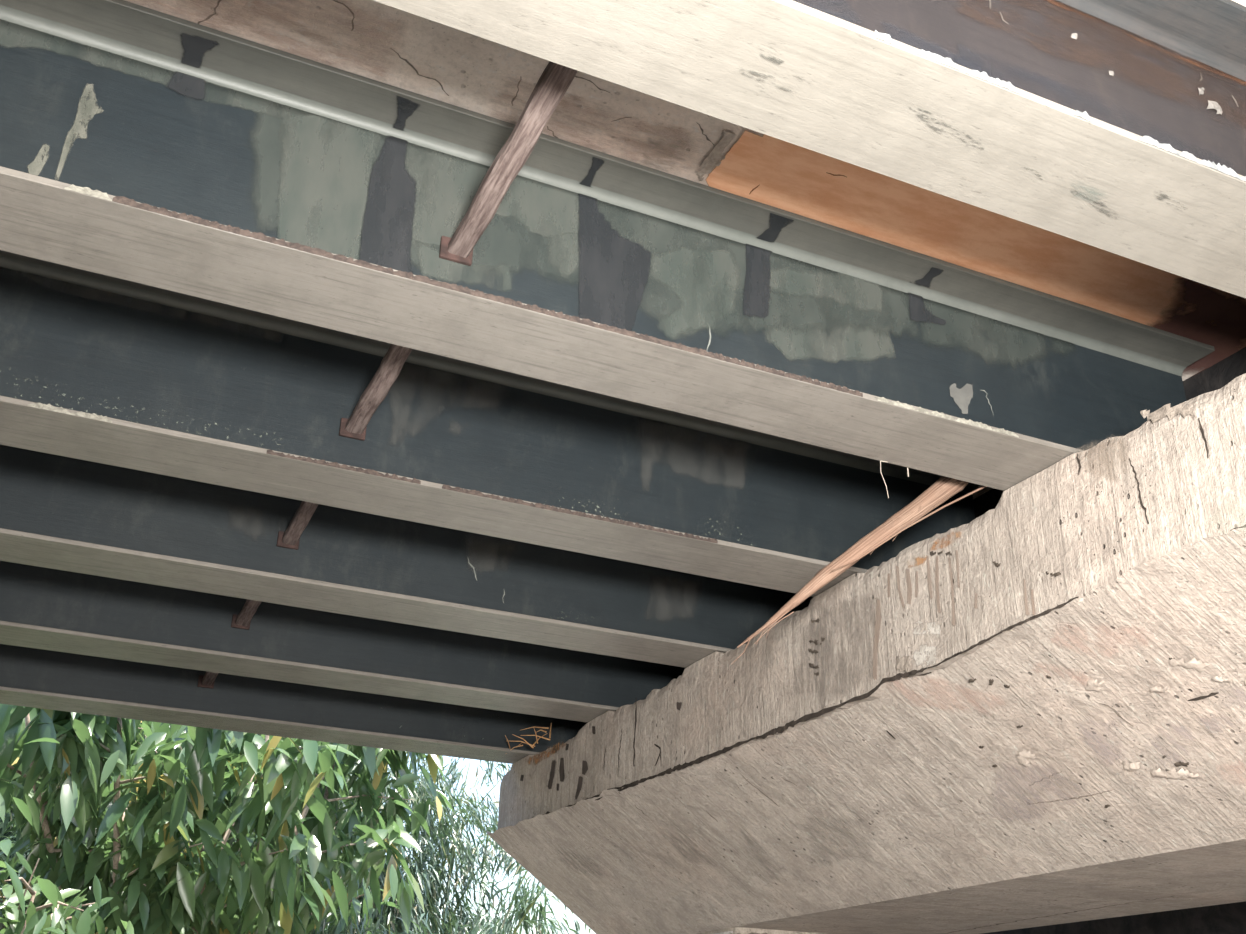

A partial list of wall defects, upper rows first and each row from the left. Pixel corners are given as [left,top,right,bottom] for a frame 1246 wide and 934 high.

crack [198,0,221,24]
crack [333,0,354,31]
crack [392,49,449,96]
crack [575,76,632,122]
peeling [27,84,112,201]
peeling [877,383,1019,438]
crack [1129,458,1149,524]
crack [531,596,1079,819]
crack [1188,692,1219,701]